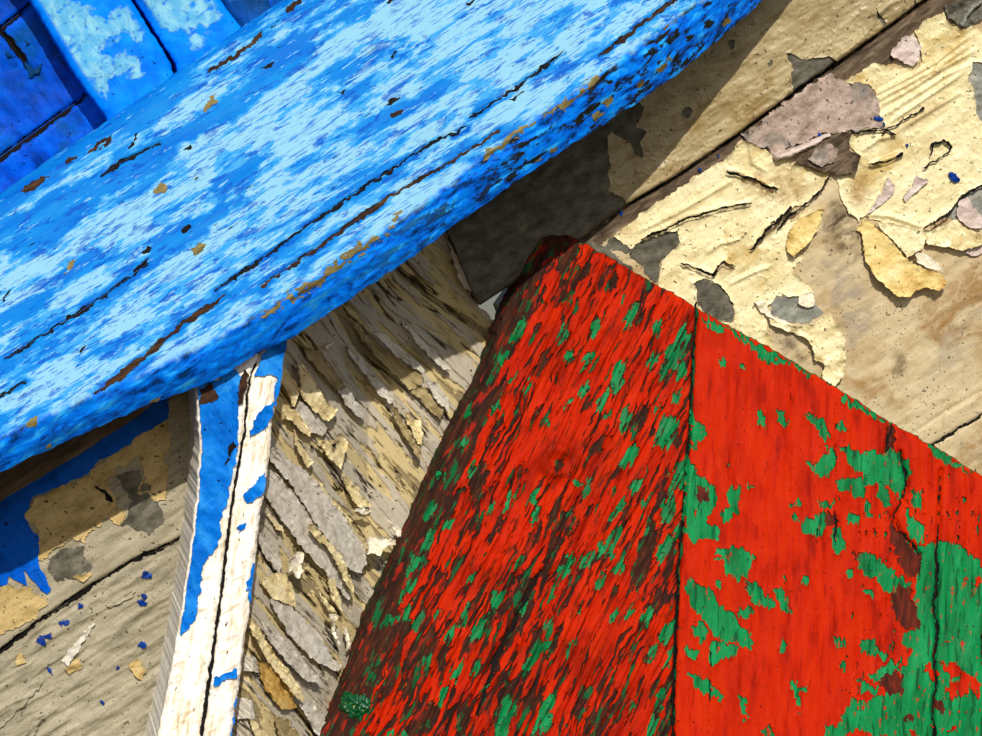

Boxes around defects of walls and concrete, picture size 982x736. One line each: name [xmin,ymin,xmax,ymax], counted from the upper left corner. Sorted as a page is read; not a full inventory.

peeling [40,0,145,100]
peeling [145,0,222,50]
peeling [207,0,302,73]
crack [94,52,562,394]
peeling [260,210,402,318]
peeling [346,318,451,459]
peeling [483,0,982,736]
peeling [0,584,48,635]
peeling [24,420,171,582]
crack [200,365,254,736]
peeling [180,340,401,736]
peeling [378,314,793,736]